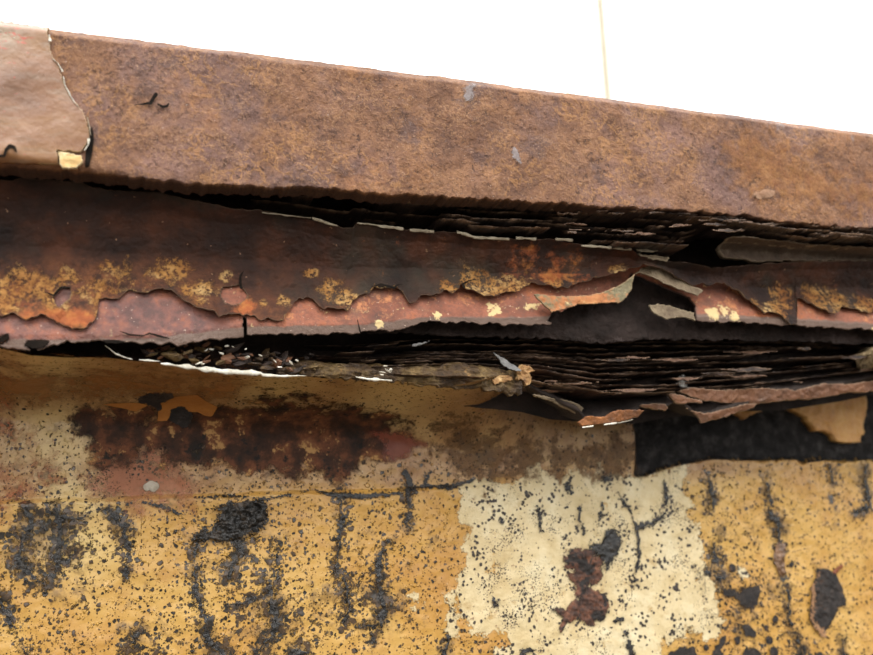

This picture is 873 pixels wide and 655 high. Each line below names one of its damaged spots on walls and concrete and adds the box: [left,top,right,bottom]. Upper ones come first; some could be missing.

crack [85,127,94,167]
spalling [752,188,775,199]
peeling [247,195,873,262]
peeling [105,345,305,377]
peeling [291,336,873,401]
peeling [158,395,217,421]
peeling [444,395,873,655]
corrosion [550,546,610,633]